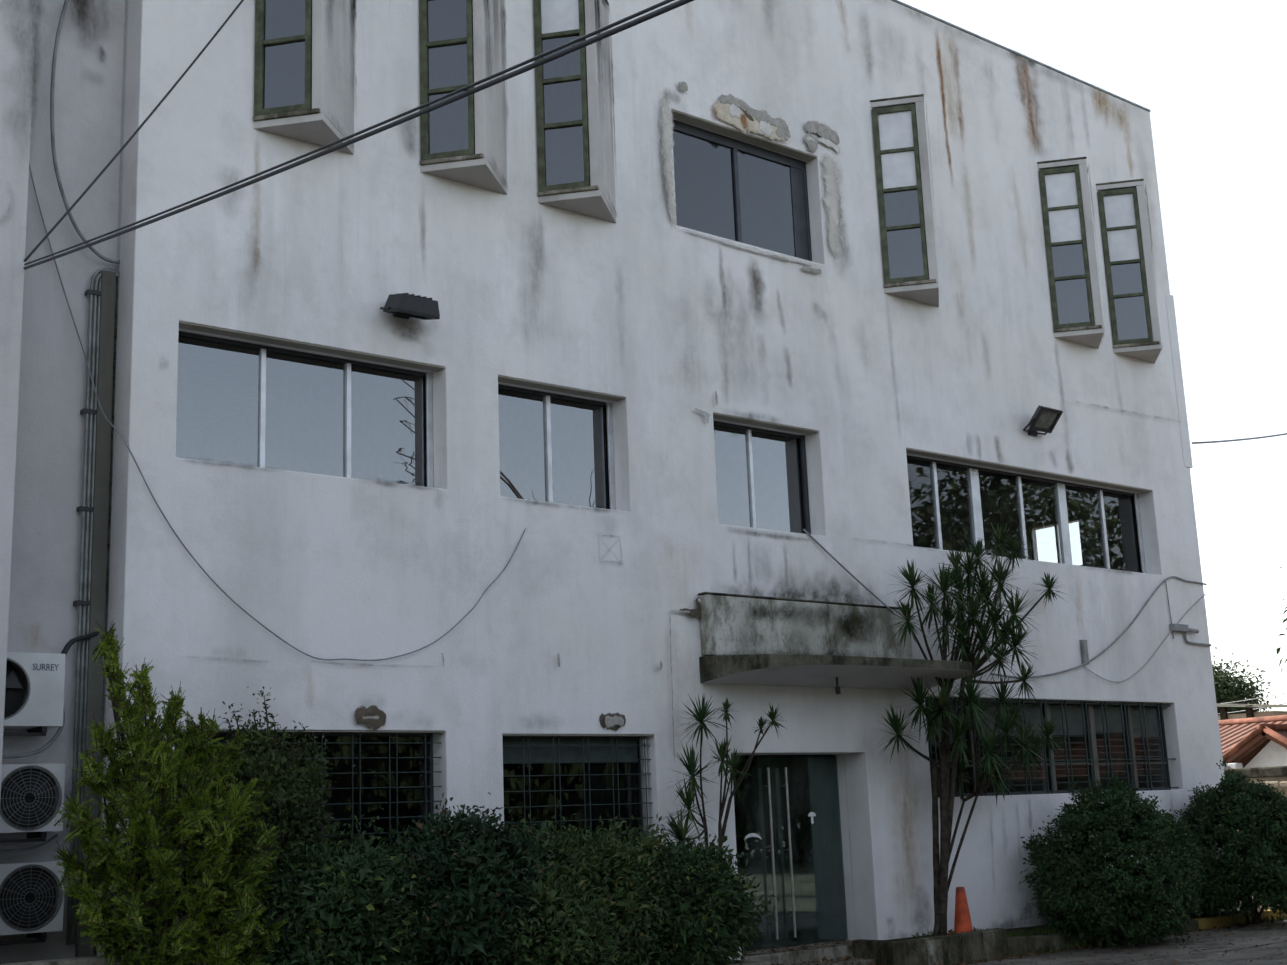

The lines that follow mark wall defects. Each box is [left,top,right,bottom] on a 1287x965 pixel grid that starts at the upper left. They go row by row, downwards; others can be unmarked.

corrosion [937,47,961,164]
corrosion [1015,54,1037,139]
flaking render [659,82,840,274]